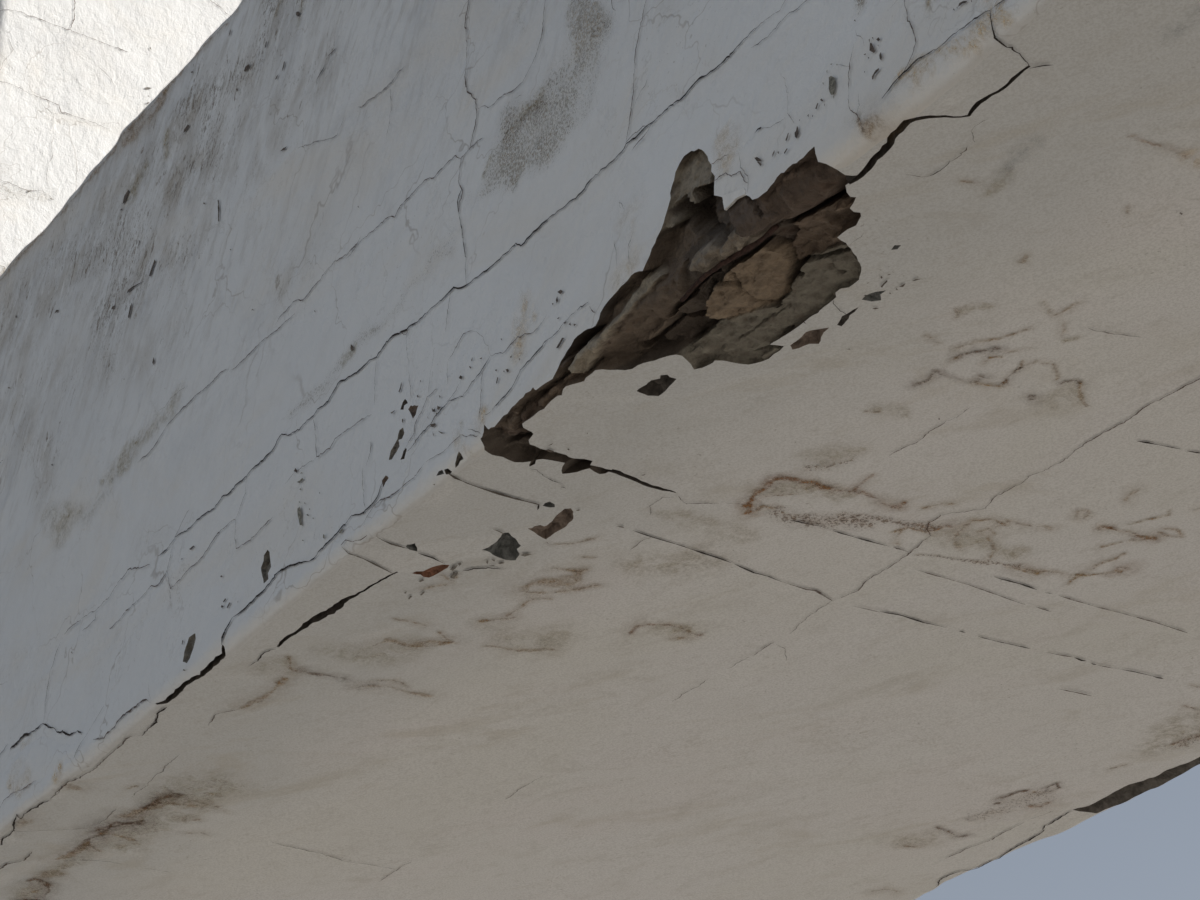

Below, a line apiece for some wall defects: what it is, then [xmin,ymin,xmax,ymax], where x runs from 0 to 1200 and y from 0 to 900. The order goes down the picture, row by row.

crack [837,0,1050,184]
spalling [481,64,919,474]
crack [0,0,807,869]
rust [743,460,1005,546]
crack [609,379,1200,700]
rust [1069,517,1180,582]